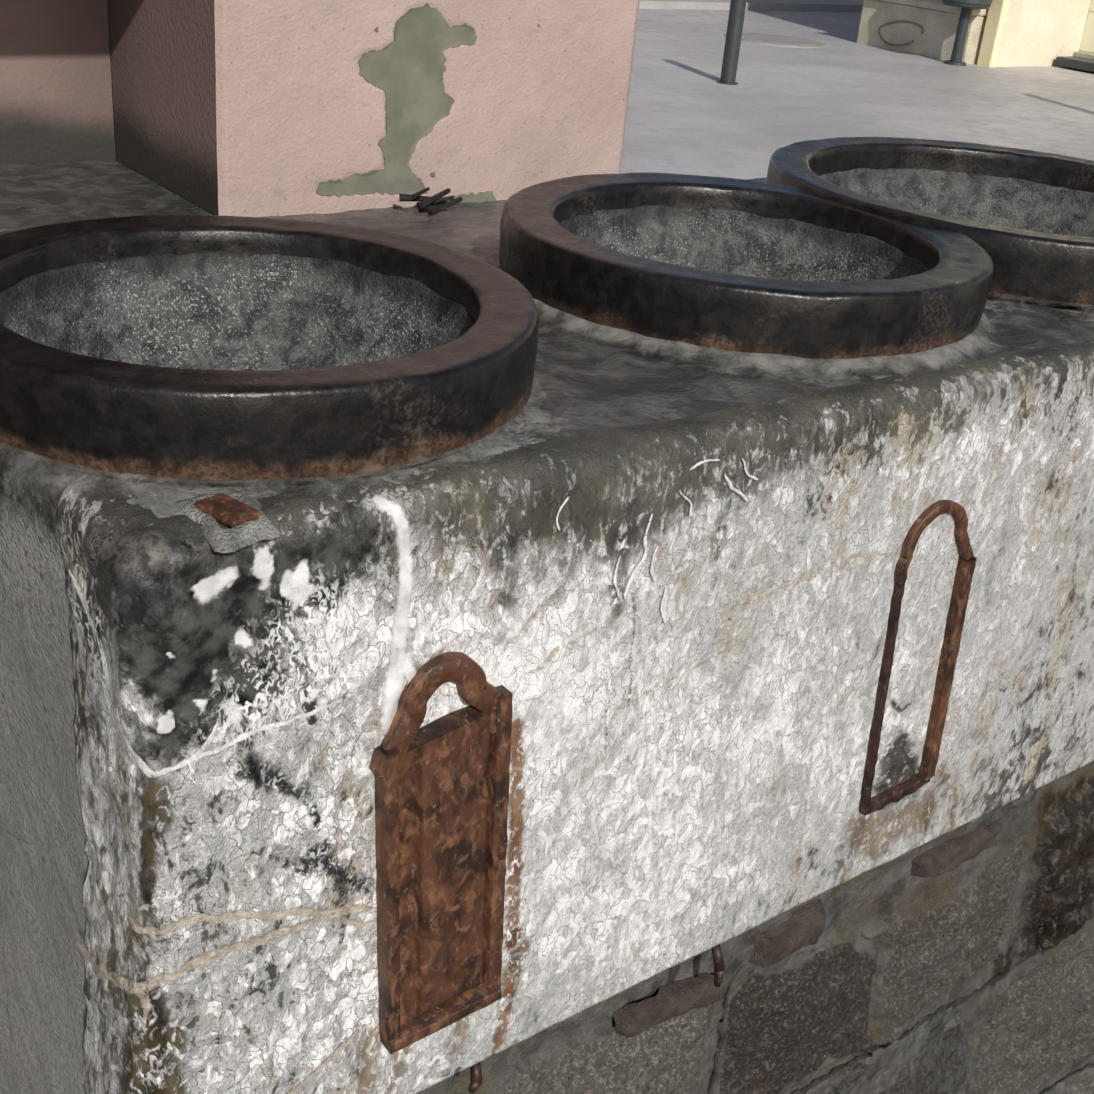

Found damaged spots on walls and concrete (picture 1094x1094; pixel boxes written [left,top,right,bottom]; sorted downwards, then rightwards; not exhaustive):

peeling [316,3,477,196]
peeling [450,191,497,203]
leakage [415,391,910,566]
leakage [110,491,416,763]
leakage [609,585,625,617]
leakage [227,757,310,800]
leakage [139,798,157,904]
corrosion [493,719,529,1051]
crack [76,892,377,1020]
corrosion [357,1028,380,1094]
corrosion [389,1046,410,1093]
corrosion [454,1015,469,1054]